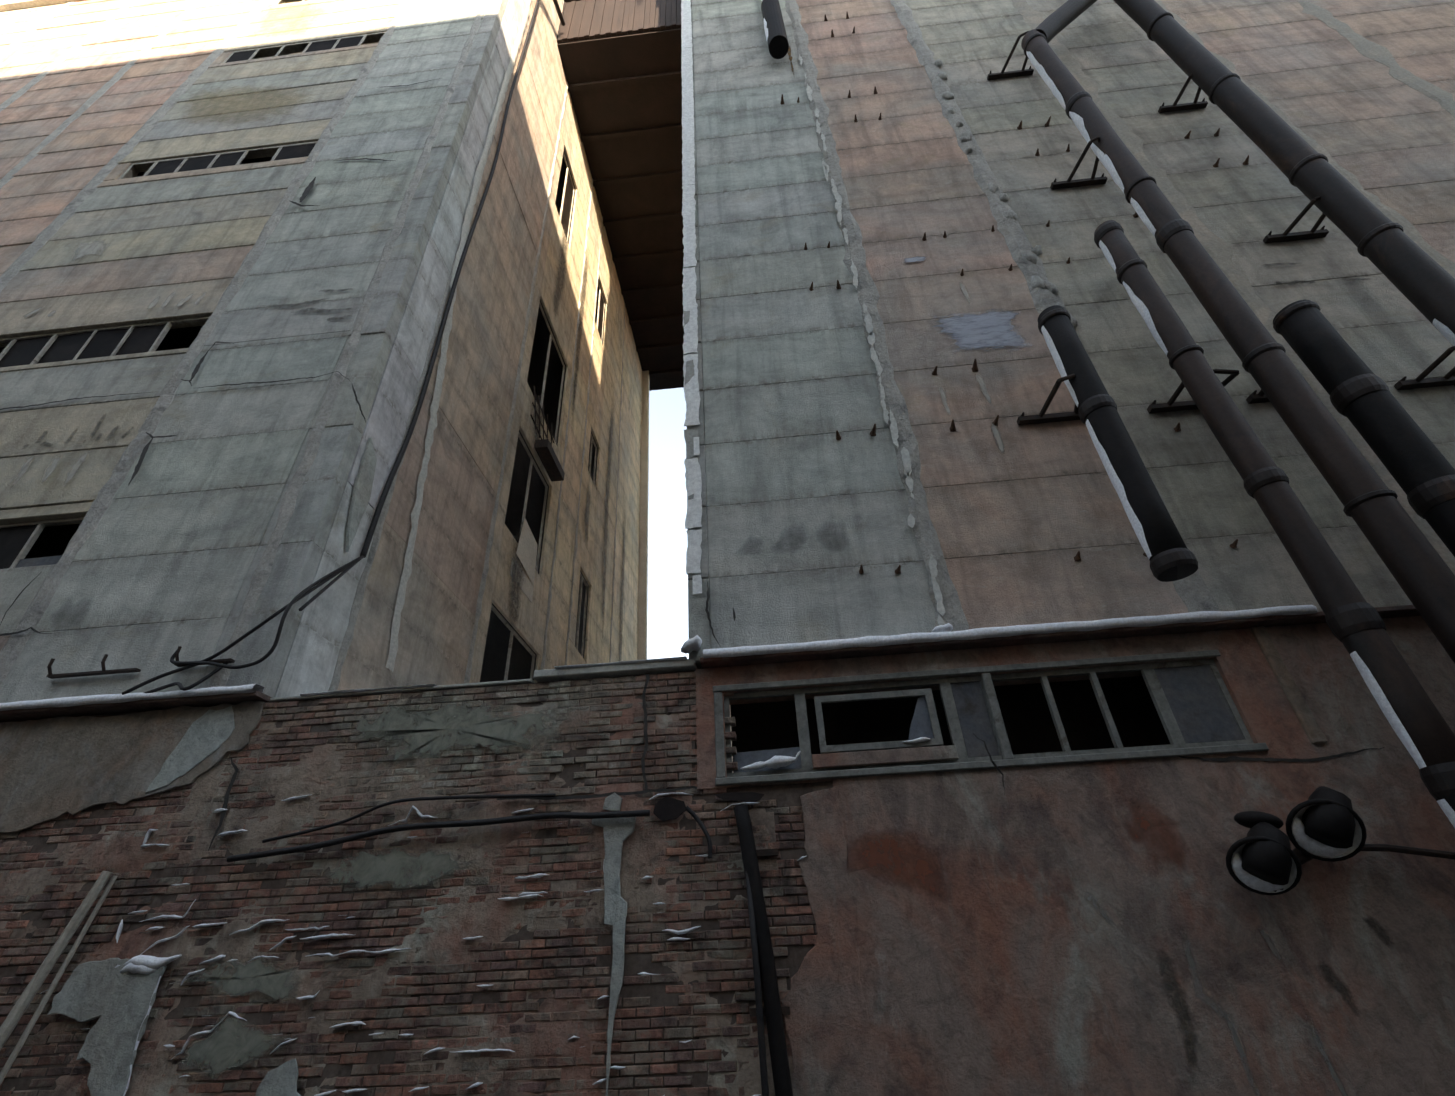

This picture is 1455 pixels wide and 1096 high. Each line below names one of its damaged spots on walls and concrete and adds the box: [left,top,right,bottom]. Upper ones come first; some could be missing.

flaking render [352,703,562,762]
flaking render [0,701,265,833]
flaking render [330,848,465,889]
flaking render [592,793,686,1096]
flaking render [192,958,297,1001]
flaking render [47,958,167,1096]
flaking render [187,1015,273,1075]
flaking render [255,1059,301,1096]